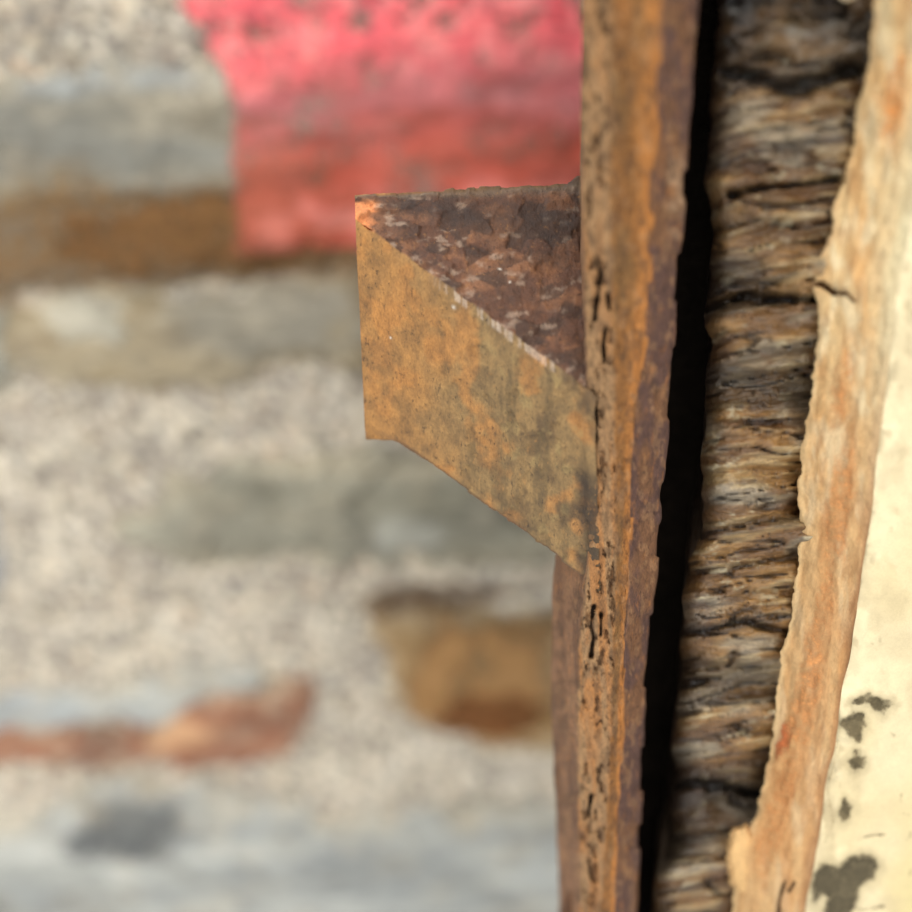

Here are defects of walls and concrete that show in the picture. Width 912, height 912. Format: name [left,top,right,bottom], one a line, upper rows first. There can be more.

corrosion [560,891,572,912]
spalling [726,0,912,912]